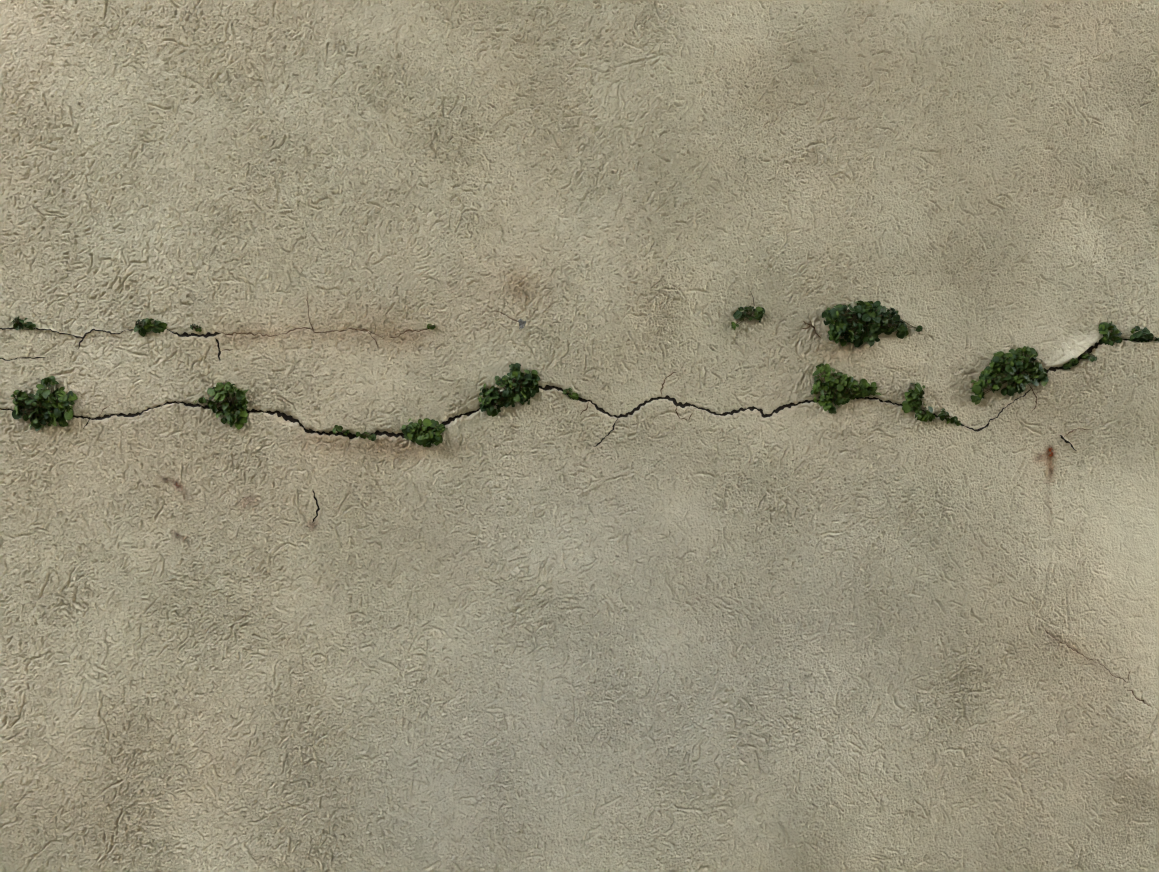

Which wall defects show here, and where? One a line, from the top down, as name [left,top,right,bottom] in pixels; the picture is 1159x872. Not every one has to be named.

crack [0,327,134,361]
crack [167,296,427,360]
crack [73,401,405,439]
crack [441,403,496,426]
crack [531,372,825,447]
crack [855,339,1140,432]